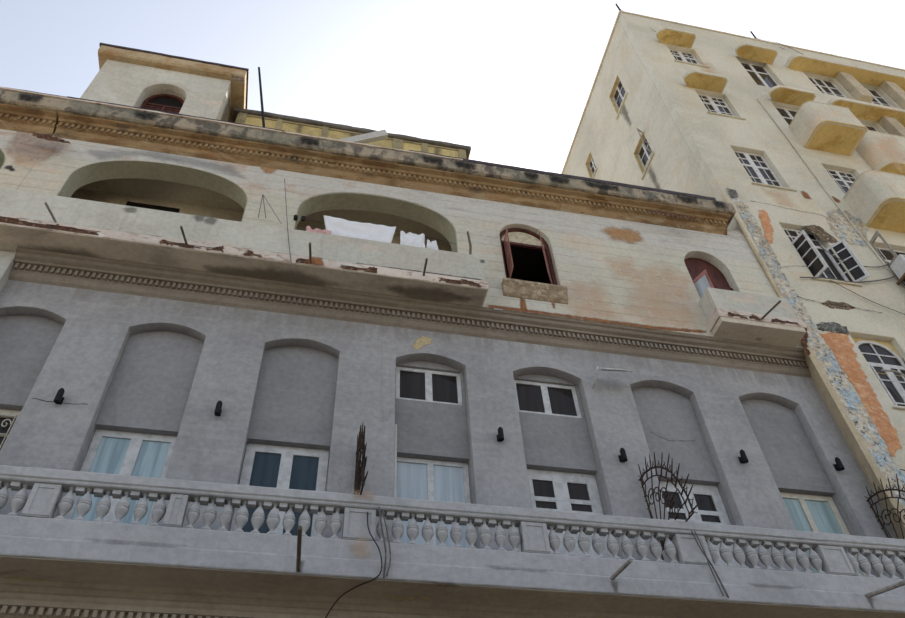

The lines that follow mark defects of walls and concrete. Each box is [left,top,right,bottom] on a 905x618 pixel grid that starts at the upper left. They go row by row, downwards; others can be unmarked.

water stain [19,93,43,101]
spalling [339,265,377,273]
spalling [727,188,905,514]